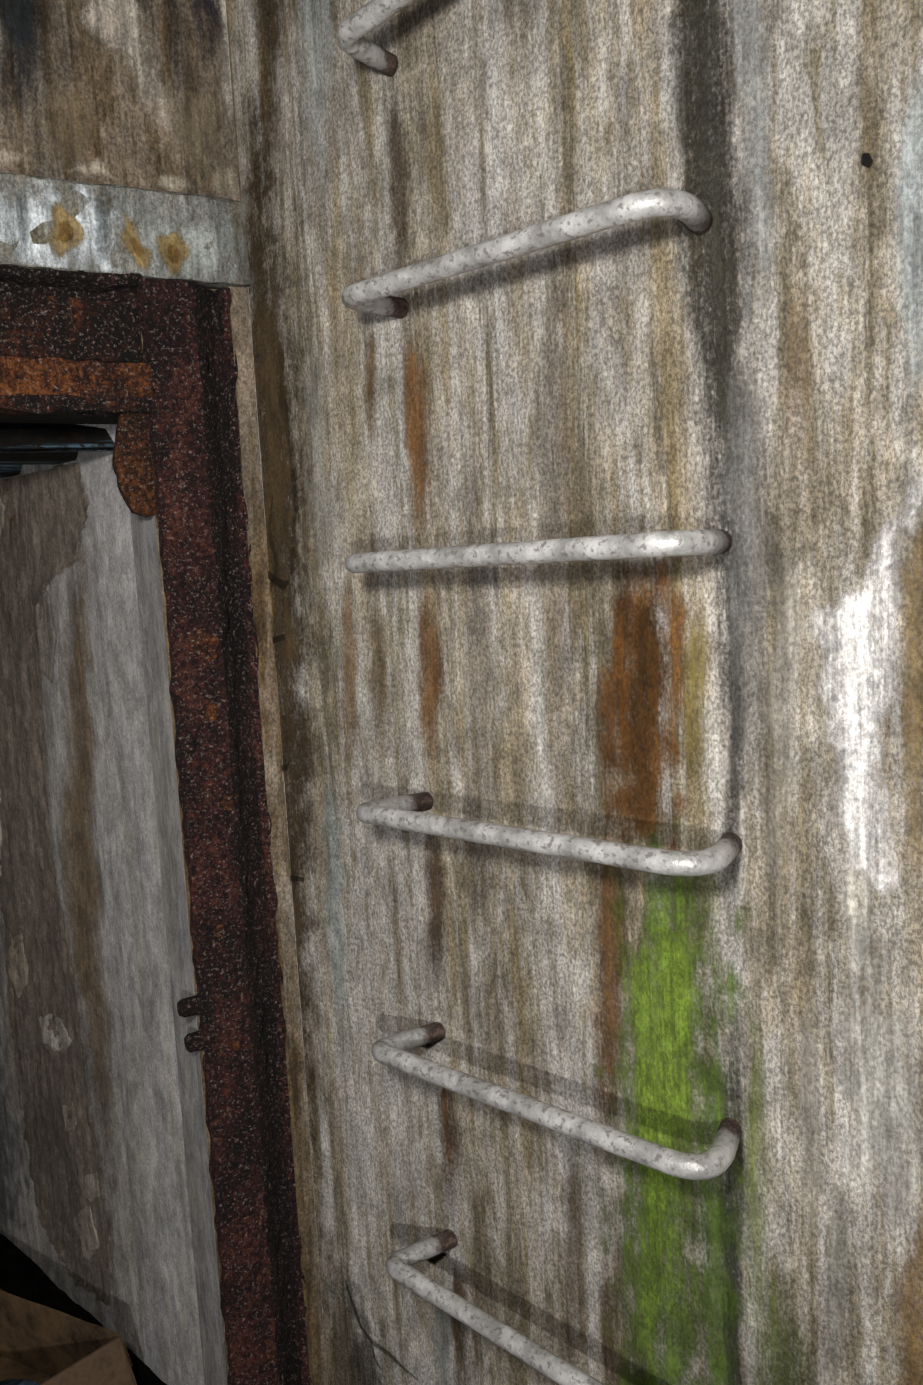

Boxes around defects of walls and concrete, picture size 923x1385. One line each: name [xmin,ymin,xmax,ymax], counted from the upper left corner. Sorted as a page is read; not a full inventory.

rust [48,203,84,257]
rust [122,216,189,274]
water stain [671,0,769,833]
rust [63,572,110,1131]
rust [595,865,625,1118]
rust [600,561,704,850]
water stain [615,876,809,1385]
water stain [812,478,923,977]
water stain [834,990,917,1206]
rust [601,1260,623,1385]